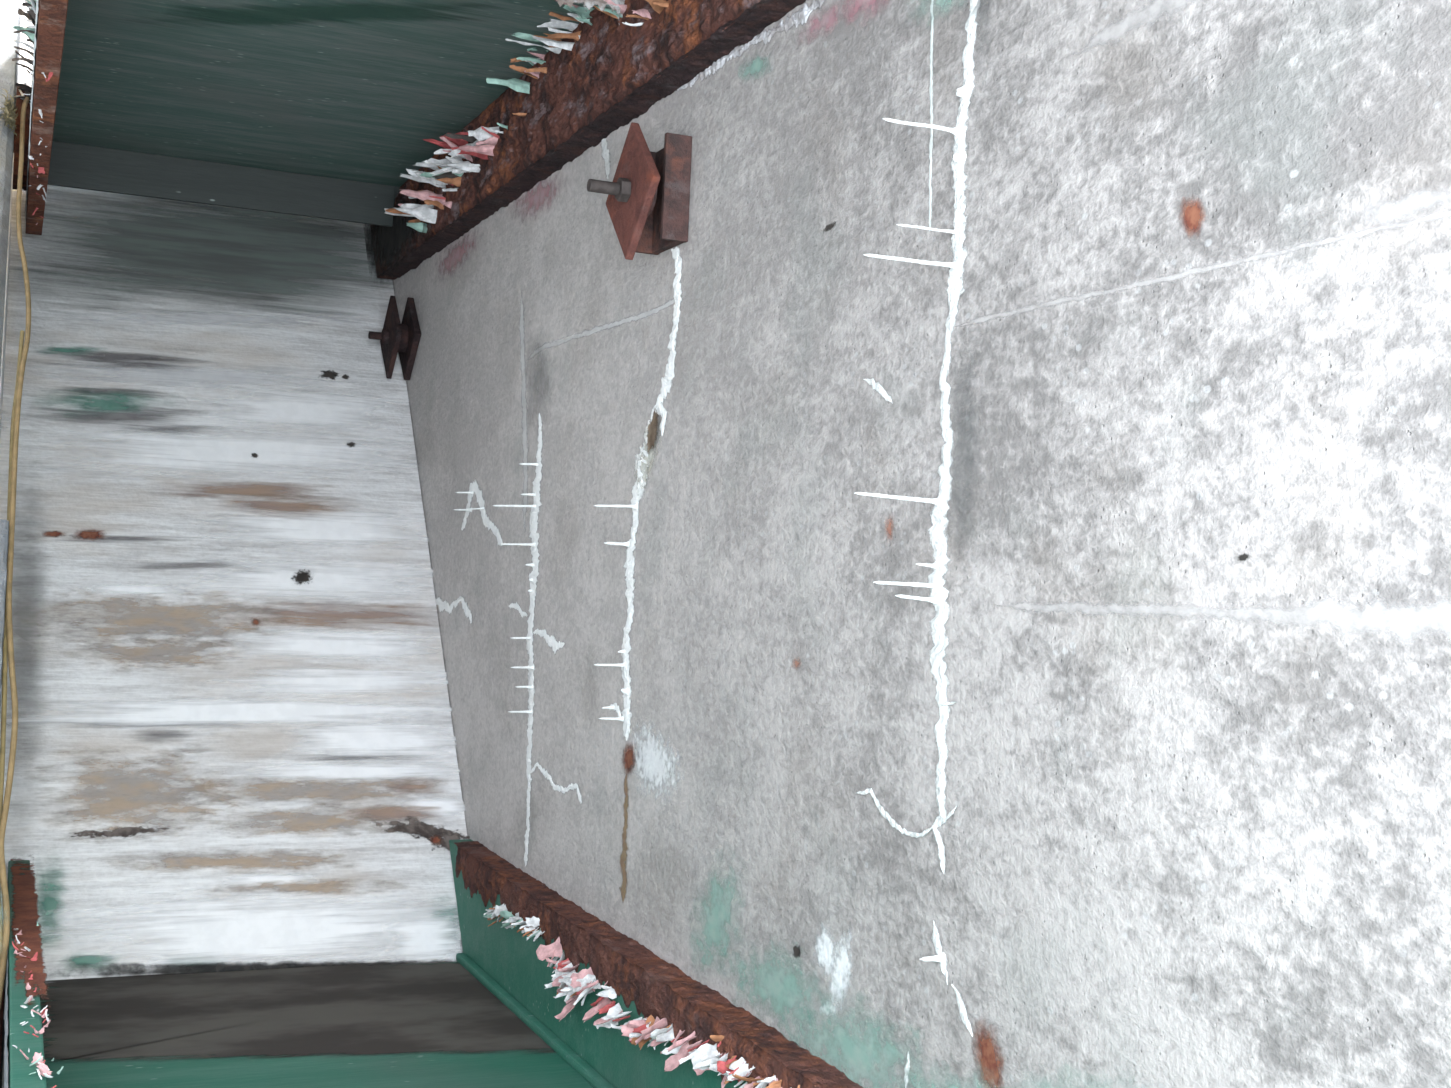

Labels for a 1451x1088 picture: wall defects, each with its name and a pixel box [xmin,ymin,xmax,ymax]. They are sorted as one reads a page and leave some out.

corrosion [26,0,68,233]
peeling [384,113,527,233]
peeling [486,0,669,94]
corrosion [379,0,806,278]
water stain [26,632,454,780]
water stain [165,561,425,596]
crack [454,413,582,867]
crack [594,246,682,741]
crack [854,0,981,873]
water stain [76,875,456,976]
peeling [483,904,800,1088]
corrosion [454,841,864,1088]